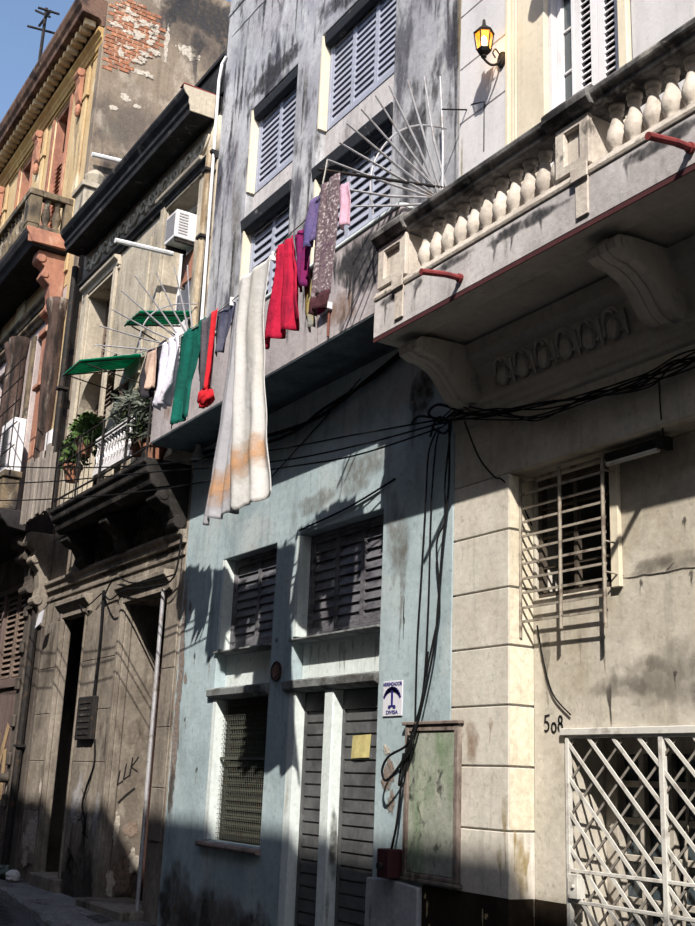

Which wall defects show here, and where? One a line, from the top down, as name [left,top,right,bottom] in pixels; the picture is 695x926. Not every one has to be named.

flaking render [102,0,201,79]
leakage [162,0,230,70]
leakage [228,0,302,166]
leakage [324,0,351,13]
leakage [447,0,460,155]
leakage [400,108,426,203]
leakage [624,119,695,169]